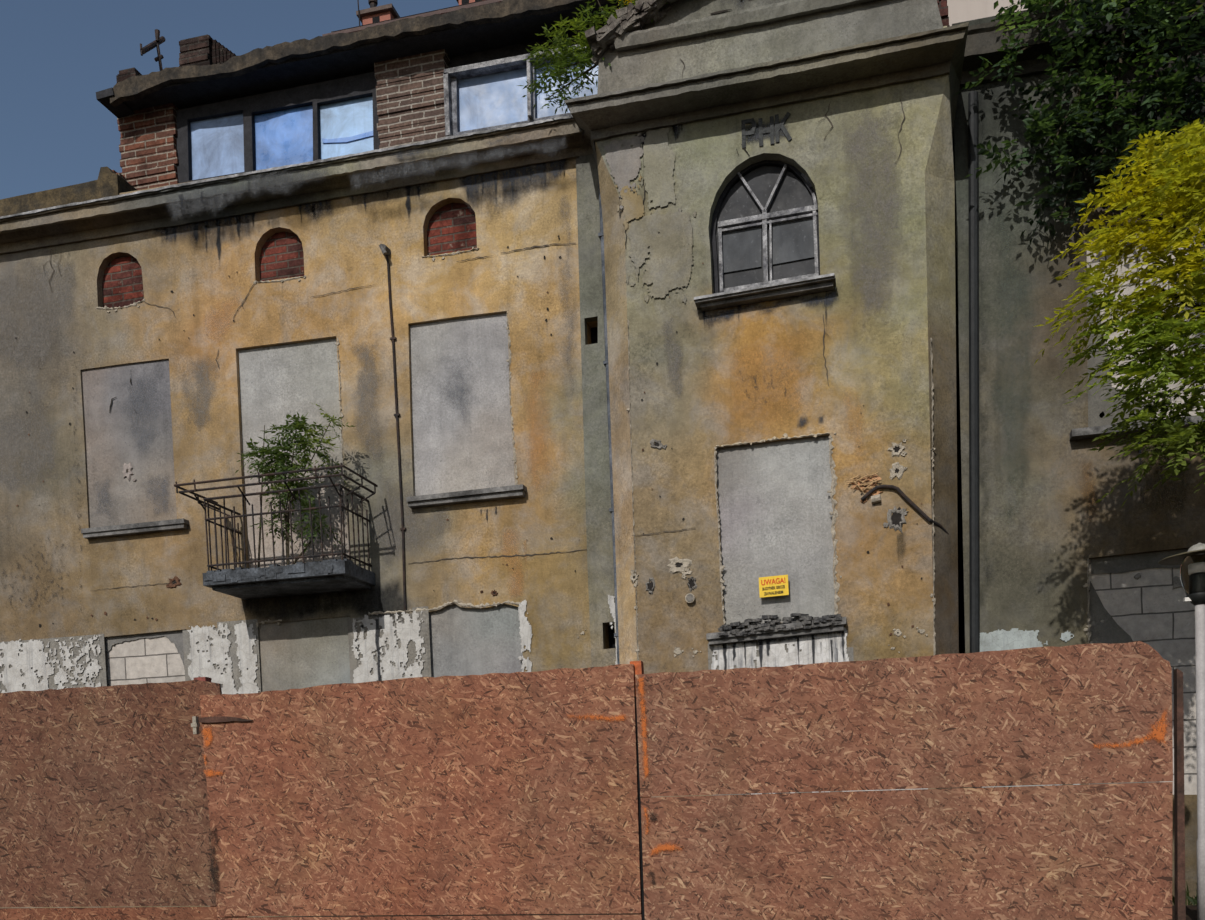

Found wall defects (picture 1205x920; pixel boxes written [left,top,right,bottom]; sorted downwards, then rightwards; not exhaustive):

damp [155,212,256,259]
damp [299,200,331,220]
damp [351,182,433,215]
spalling [627,319,672,661]
spalling [883,338,936,655]
peeling [0,616,282,694]
peeling [347,590,533,683]
spalling [667,557,697,592]
peeling [673,432,907,670]
spalling [979,549,1188,652]
peeling [713,788,928,796]